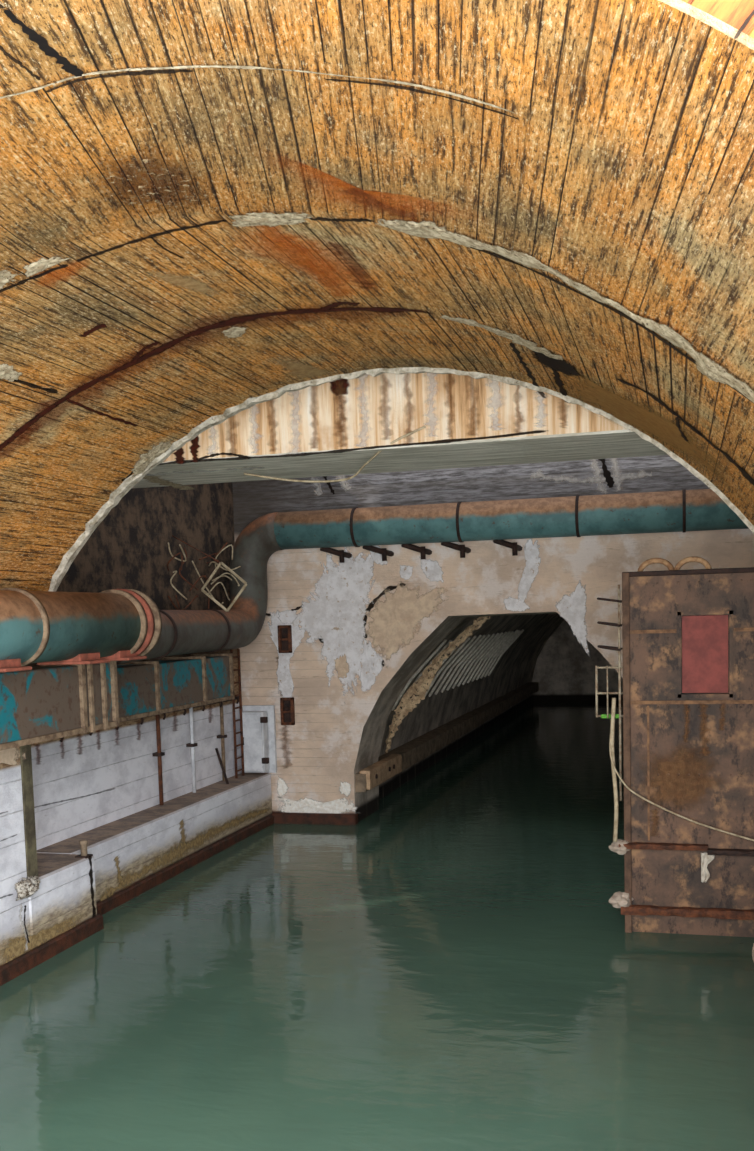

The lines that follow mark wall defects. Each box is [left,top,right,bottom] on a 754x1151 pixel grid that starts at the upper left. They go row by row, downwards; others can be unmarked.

crack [0,4,518,119]
crack [77,220,227,262]
corrosion [173,427,215,464]
crack [0,302,428,451]
corrosion [330,375,367,446]
crack [510,343,568,403]
crack [618,379,754,485]
peeling [266,545,443,698]
damp [0,917,78,963]